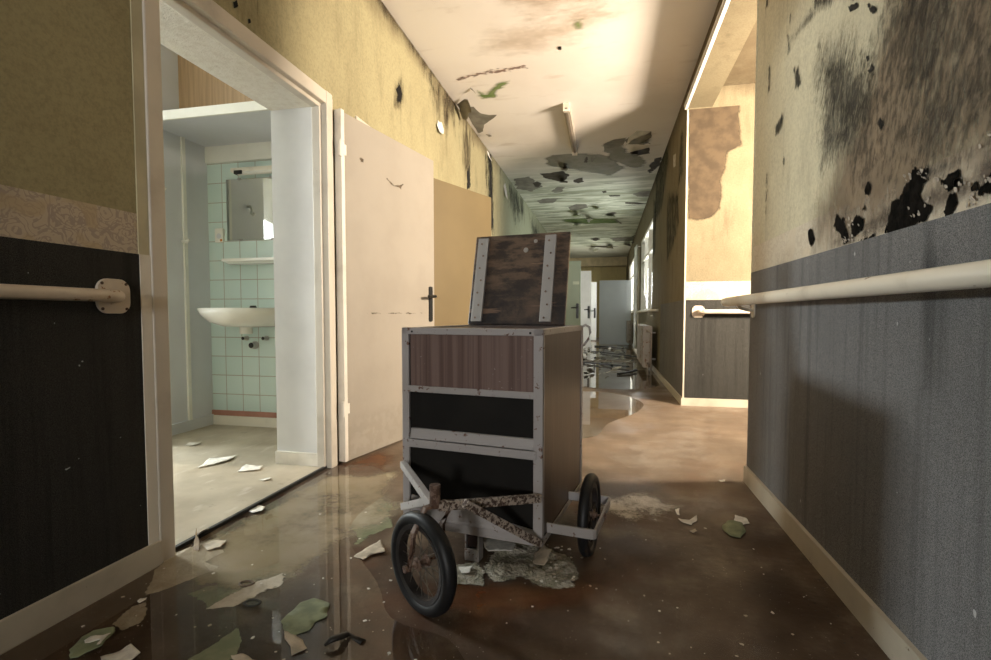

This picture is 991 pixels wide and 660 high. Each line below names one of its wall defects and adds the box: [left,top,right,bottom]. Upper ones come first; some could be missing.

leakage [423,59,454,123]
peeling [457,88,496,137]
leakage [817,0,991,240]
leakage [464,127,474,189]
leakage [485,152,494,230]
leakage [509,186,539,234]
peeling [504,131,676,204]
peeling [562,204,622,226]
peeling [590,235,635,249]
leakage [653,105,742,259]
spalling [833,167,991,245]